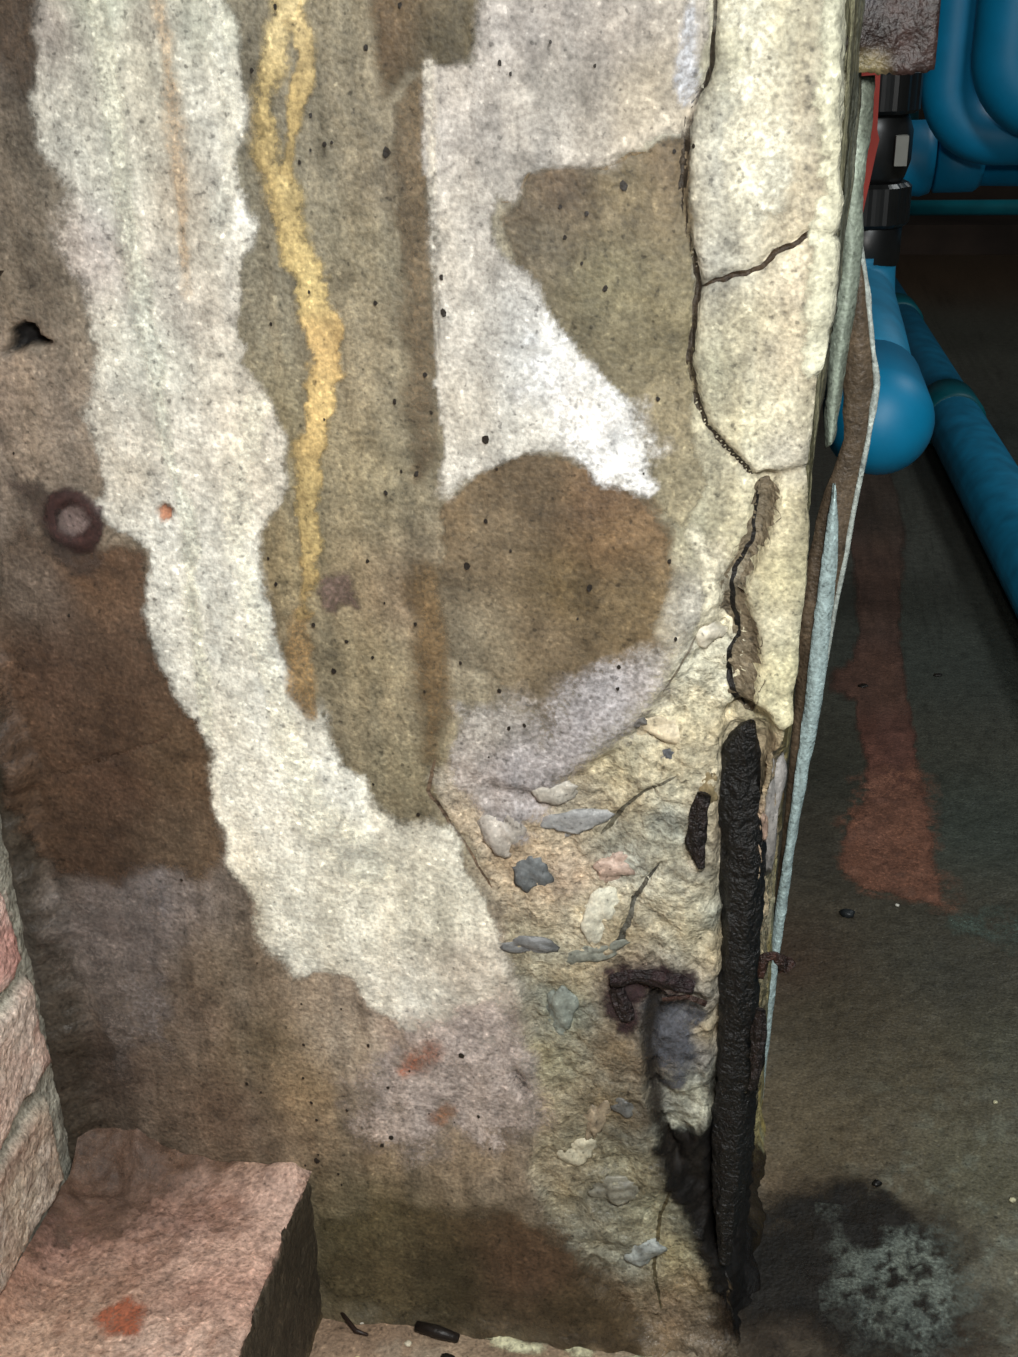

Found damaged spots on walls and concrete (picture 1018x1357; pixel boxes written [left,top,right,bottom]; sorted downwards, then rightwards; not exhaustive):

crack [592,152,646,170]
crack [678,0,809,711]
corrosion [8,481,103,574]
water stain [0,0,541,1149]
water stain [413,137,732,841]
crack [663,636,696,692]
spalling [426,474,941,1357]
corrosion [685,791,711,870]
corrosion [757,951,796,980]
corrosion [652,1007,767,1342]
water stain [322,1201,645,1357]
water stain [737,1179,991,1357]